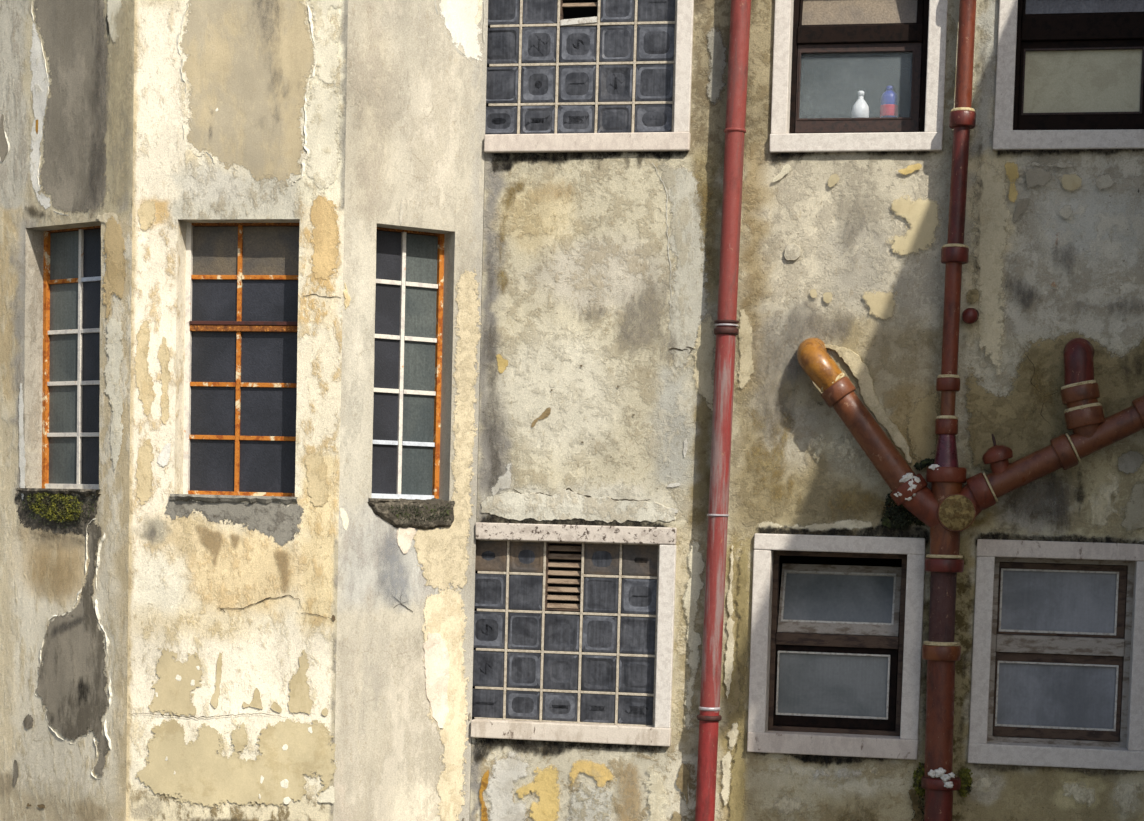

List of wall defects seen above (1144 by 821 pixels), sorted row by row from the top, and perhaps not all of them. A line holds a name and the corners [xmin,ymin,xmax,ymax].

peeling [434,0,485,67]
peeling [30,0,109,216]
peeling [176,0,317,187]
peeling [886,195,943,255]
damp [748,311,848,501]
damp [760,524,929,548]
damp [975,474,1144,546]
crack [218,595,336,620]
flaking render [23,518,112,780]
peeling [135,648,337,808]
peeling [516,759,617,821]